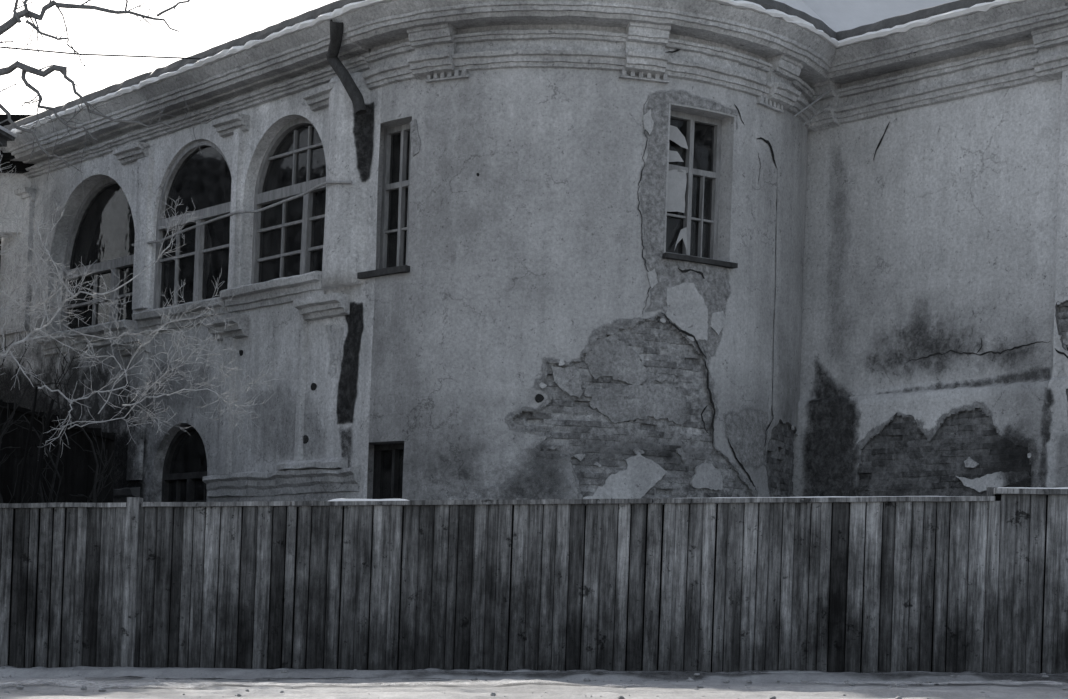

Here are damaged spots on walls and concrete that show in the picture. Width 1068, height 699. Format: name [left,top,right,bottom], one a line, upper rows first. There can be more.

leakage [353,102,374,182]
leakage [336,302,363,467]
flaking render [505,90,798,504]
leakage [803,362,859,497]
flaking render [851,401,1041,503]
leakage [868,324,1054,488]
crack [906,337,1068,363]
flaking render [1055,296,1068,351]